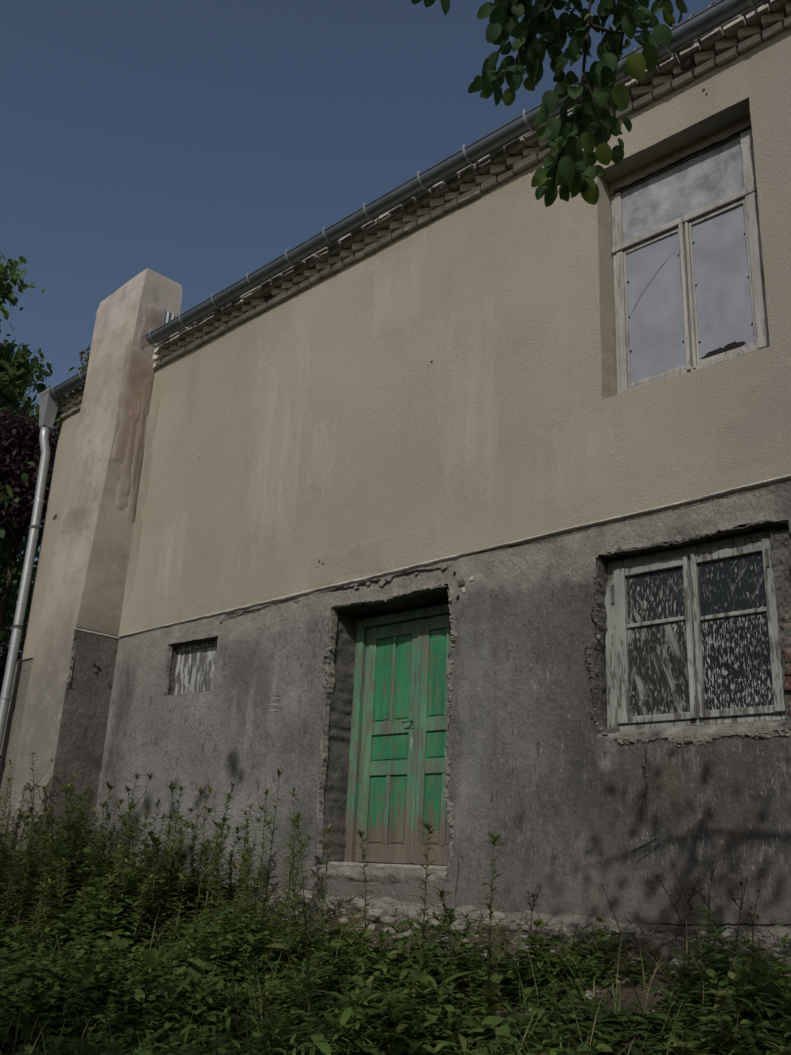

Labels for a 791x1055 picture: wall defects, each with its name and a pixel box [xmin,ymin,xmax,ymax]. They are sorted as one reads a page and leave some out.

spalling [316,571,473,868]
spalling [584,519,791,747]